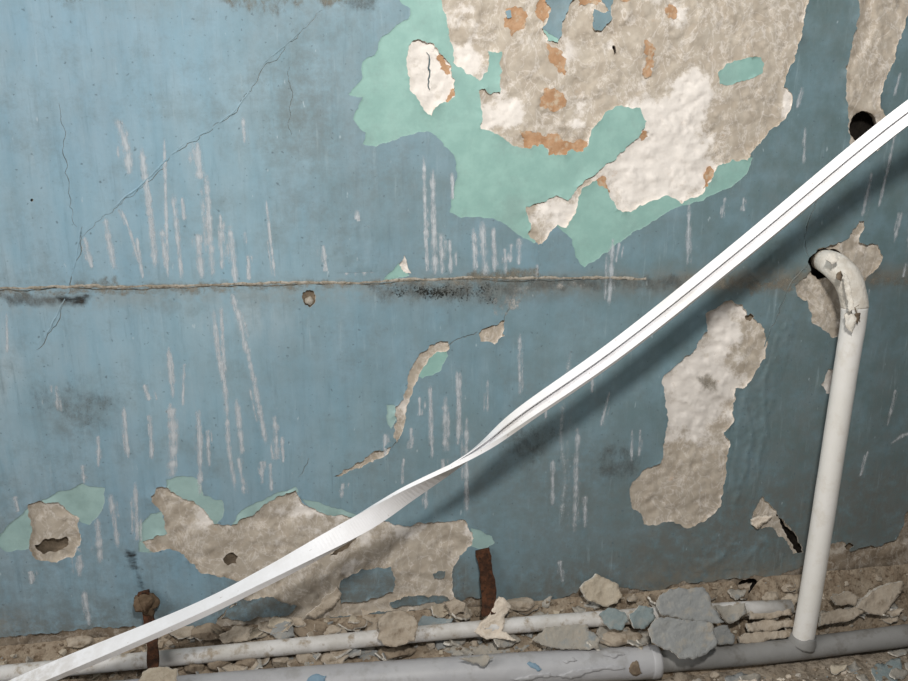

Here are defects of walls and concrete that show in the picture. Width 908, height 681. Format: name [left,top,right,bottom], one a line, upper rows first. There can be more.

crack [0,9,668,350]
peeling [349,0,808,267]
spalling [846,0,908,145]
spalling [795,221,883,338]
peeling [336,297,513,477]
peeling [630,300,767,528]
peeling [0,483,105,562]
spalling [0,626,137,646]
peeling [138,476,356,581]
peeling [215,519,494,644]
spalling [752,497,802,554]
spalling [827,511,908,571]